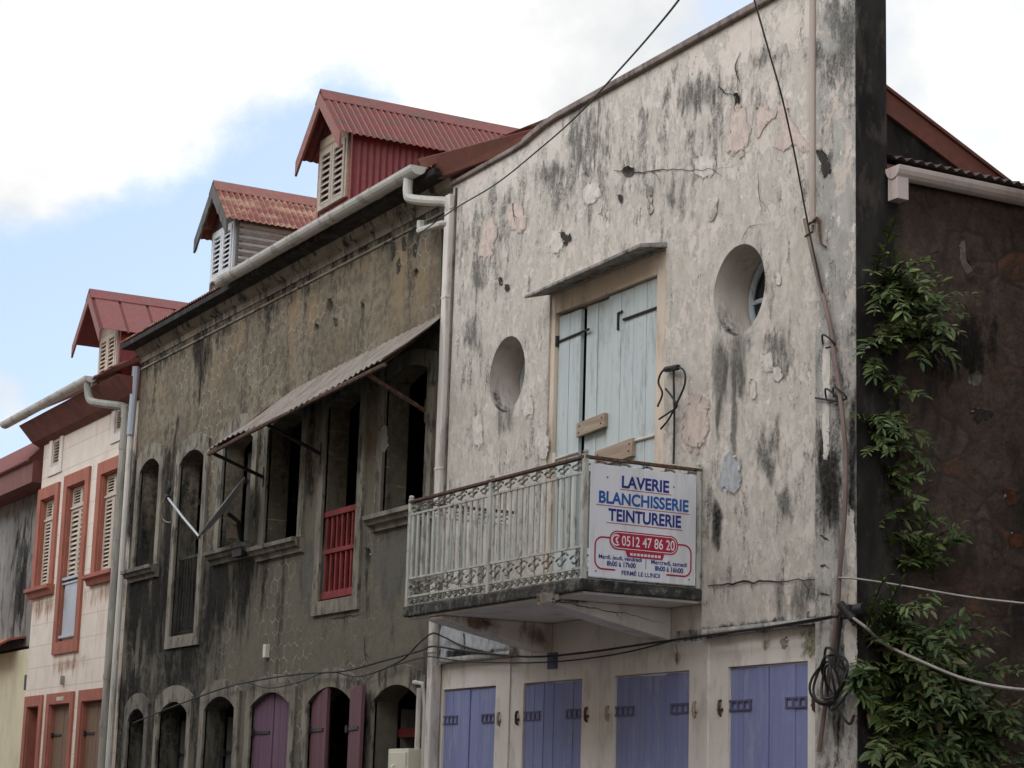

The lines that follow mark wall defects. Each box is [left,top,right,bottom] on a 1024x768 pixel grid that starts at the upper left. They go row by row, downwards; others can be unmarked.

leakage [664,70,720,113]
crack [614,160,729,179]
peeling [755,95,832,179]
peeling [477,200,527,263]
peeling [548,224,571,258]
leakage [714,323,745,453]
leakage [818,393,857,535]
leakage [712,501,722,549]
leakage [11,511,33,635]
leakage [116,418,268,729]
crack [707,535,829,604]